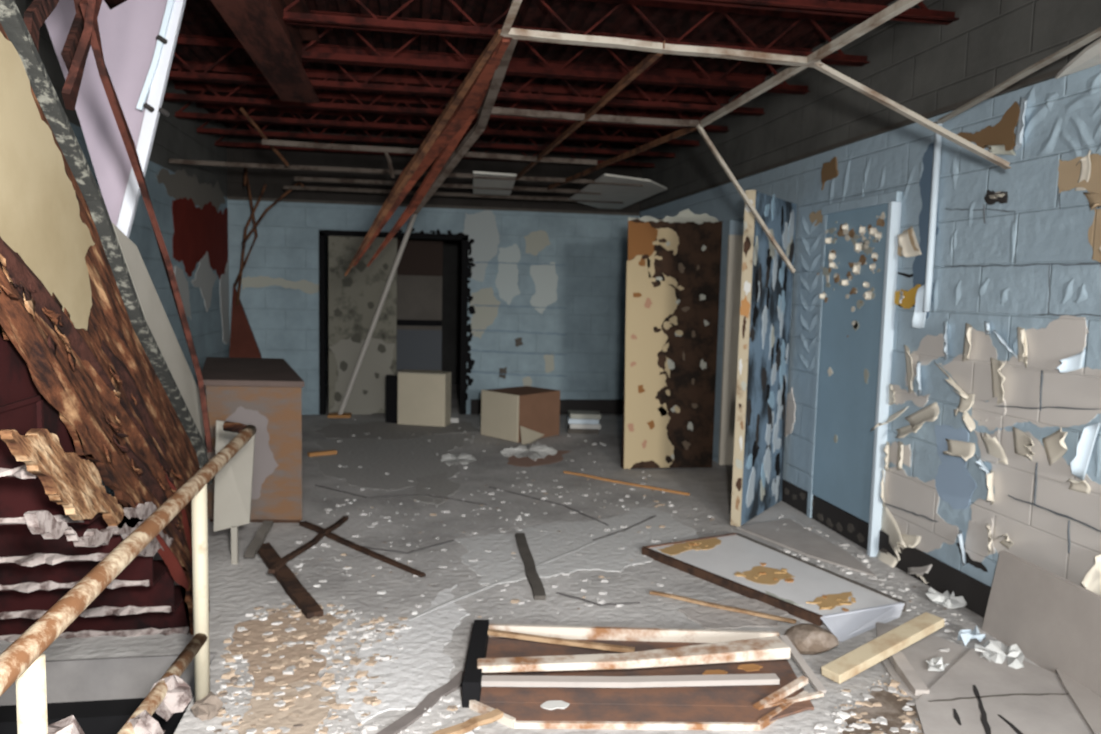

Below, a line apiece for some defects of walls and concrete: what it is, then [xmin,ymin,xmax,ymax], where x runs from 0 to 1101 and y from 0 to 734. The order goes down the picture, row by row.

peeling [155,168,230,345]
peeling [809,209,885,337]
peeling [1058,154,1101,193]
peeling [1088,208,1101,263]
peeling [642,232,709,450]
peeling [735,194,814,510]
peeling [0,465,38,479]
rust [103,364,143,476]
peeling [879,315,1101,588]